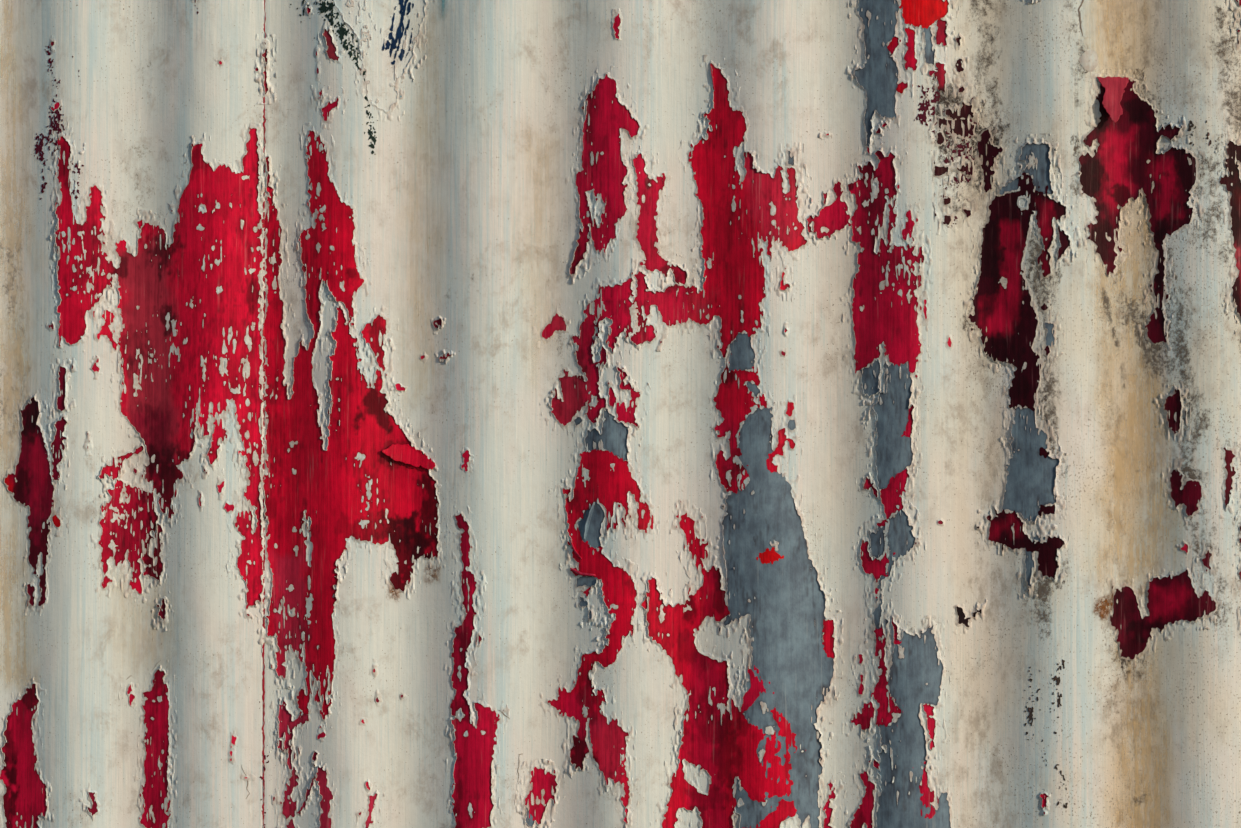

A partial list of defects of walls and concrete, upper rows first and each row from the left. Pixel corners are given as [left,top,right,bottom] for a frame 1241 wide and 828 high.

peeling [0,0,510,828]
peeling [514,0,1241,828]